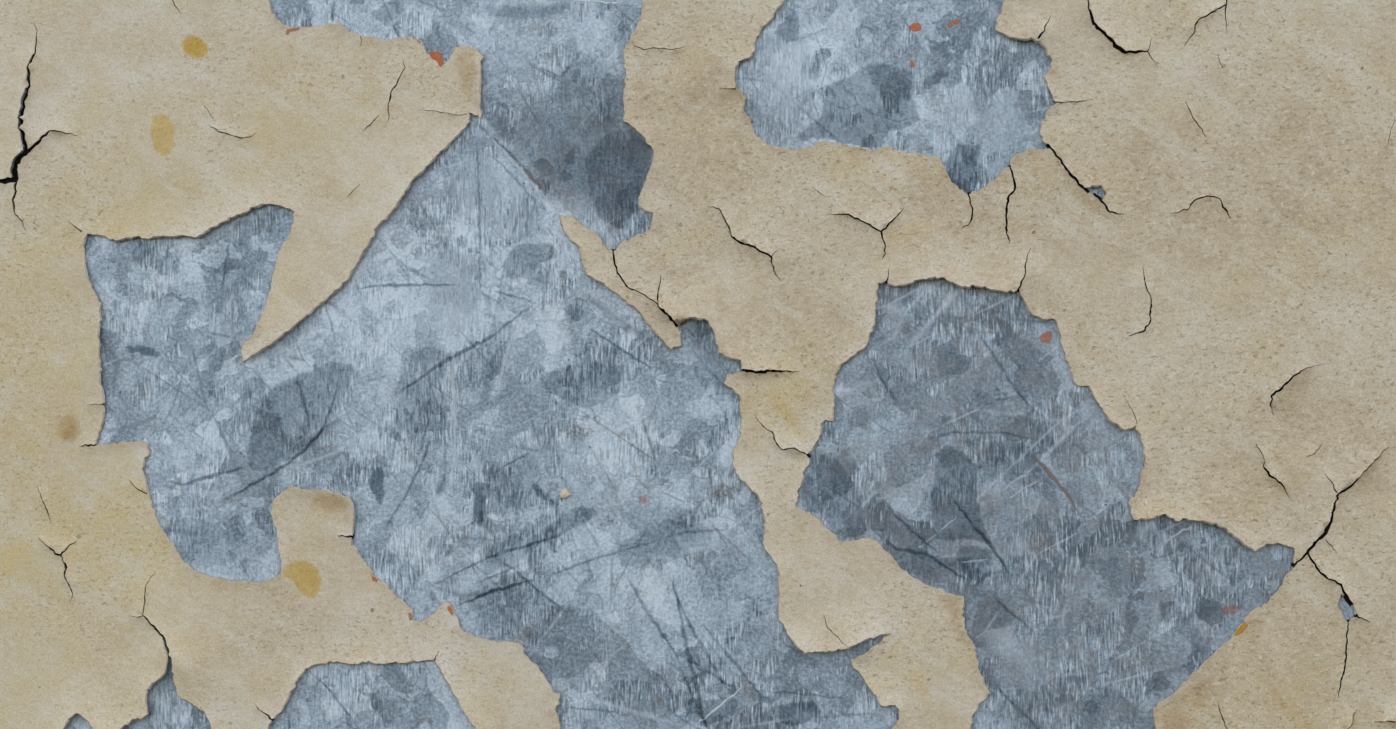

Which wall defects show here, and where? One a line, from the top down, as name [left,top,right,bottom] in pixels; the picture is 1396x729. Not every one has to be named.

crack [1087,0,1155,62]
crack [1184,0,1227,68]
crack [0,26,76,221]
peeling [735,0,1055,194]
crack [707,206,781,281]
crack [812,187,903,283]
peeling [1087,187,1105,199]
peeling [84,0,899,729]
peeling [796,238,1294,729]
crack [37,485,76,593]
crack [1291,443,1396,722]
peeling [55,660,211,729]